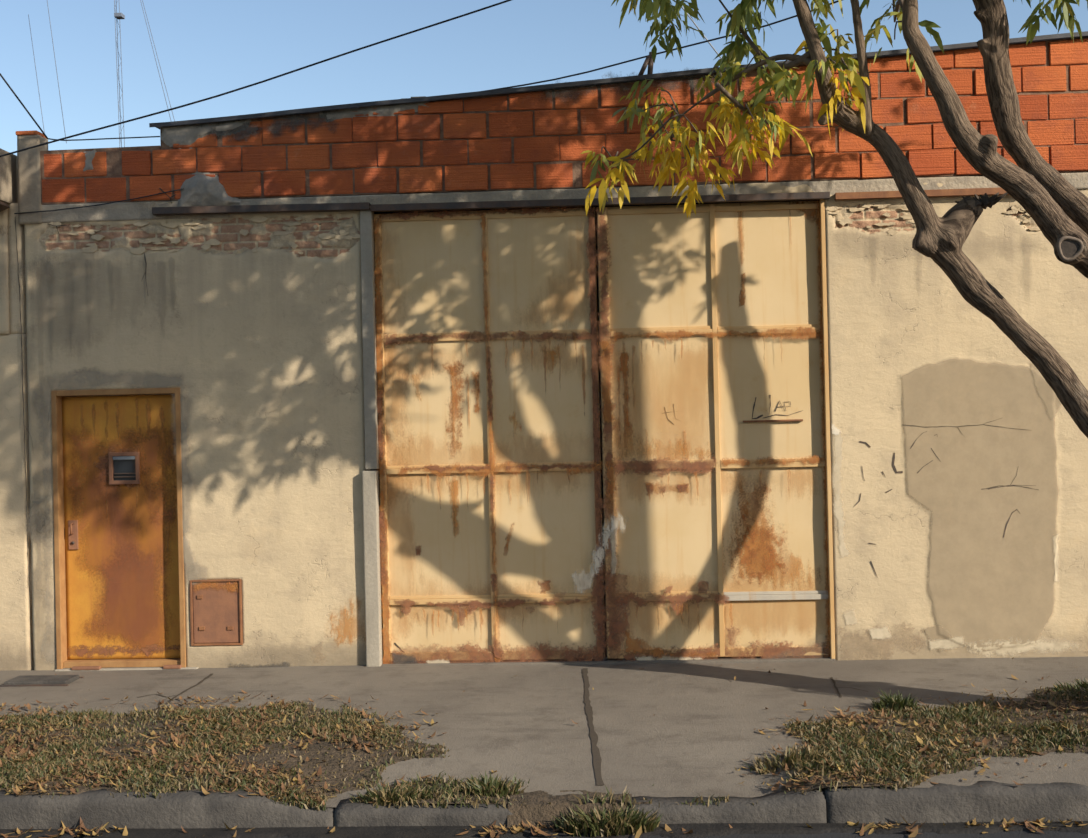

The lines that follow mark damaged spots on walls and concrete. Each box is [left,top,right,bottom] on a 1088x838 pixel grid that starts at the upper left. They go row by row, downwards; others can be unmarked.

spalling [35,213,360,259]
spalling [825,202,916,235]
spalling [1003,205,1040,231]
corrosion [373,200,831,664]
corrosion [68,399,179,658]